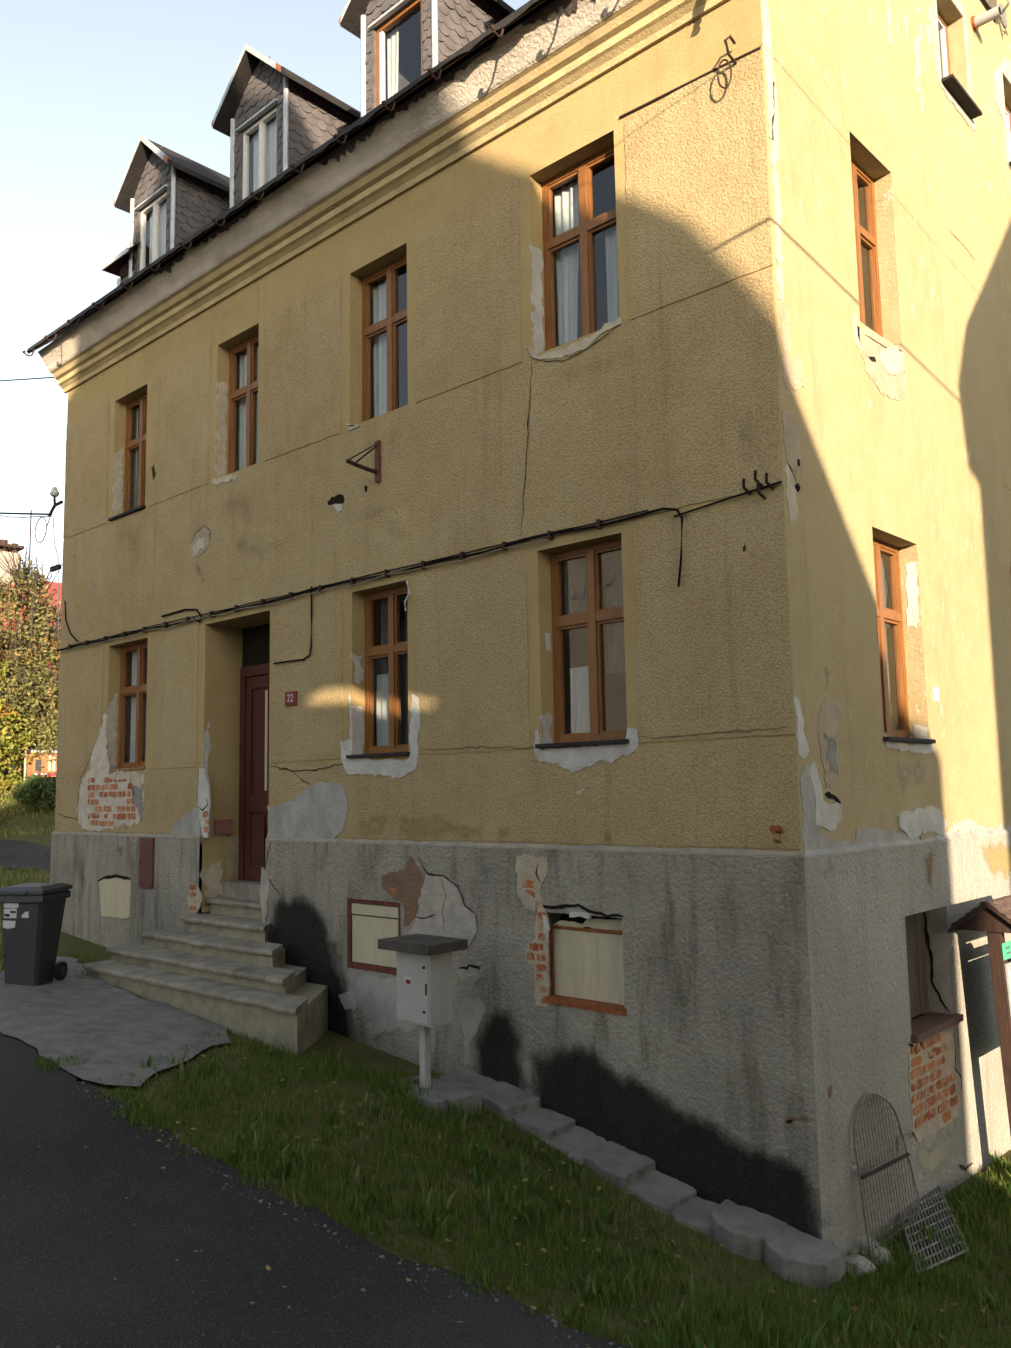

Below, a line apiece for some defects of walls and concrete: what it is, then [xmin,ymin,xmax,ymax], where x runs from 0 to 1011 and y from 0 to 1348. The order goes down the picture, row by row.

peeling [868,0,939,113]
peeling [761,0,805,391]
spalling [852,313,908,401]
peeling [782,410,804,524]
flaking render [76,692,144,832]
peeling [793,696,842,831]
peeling [898,806,978,840]
spalling [381,855,425,926]
flaking render [515,854,551,1007]
spalling [927,907,955,1014]
flaking render [907,1030,962,1142]